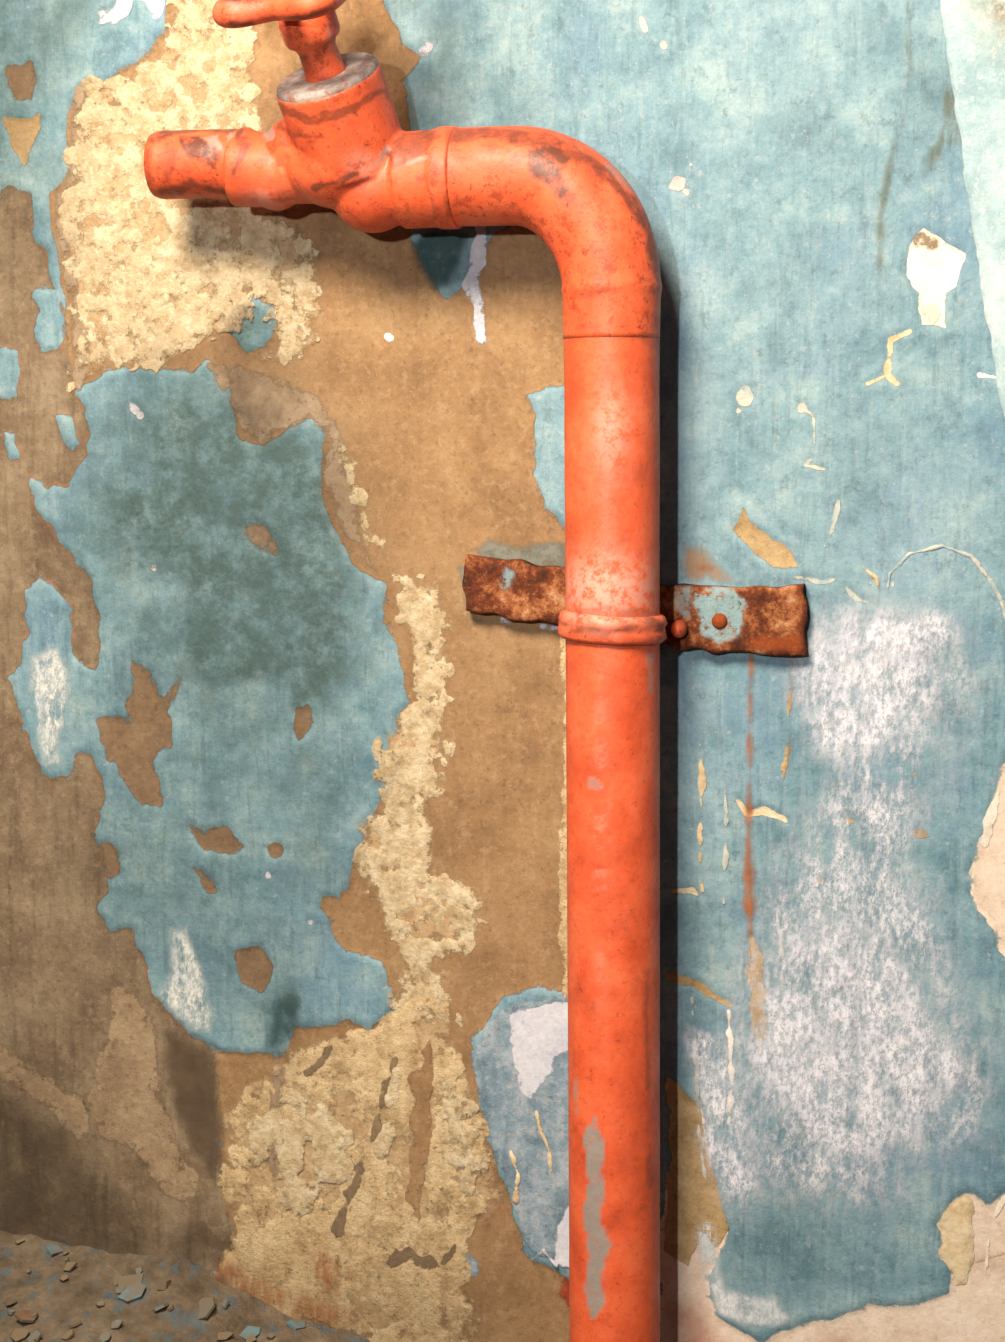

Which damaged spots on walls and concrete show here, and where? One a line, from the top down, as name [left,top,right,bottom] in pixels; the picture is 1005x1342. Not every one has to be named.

rust [686,551,719,578]
peeling [0,0,570,1342]
peeling [698,744,706,806]
peeling [780,746,790,779]
water stain [686,609,989,1203]
peeling [913,828,929,839]
peeling [969,762,1005,957]
peeling [726,1009,735,1125]
peeling [660,1035,1005,1342]
water stain [697,1224,787,1326]